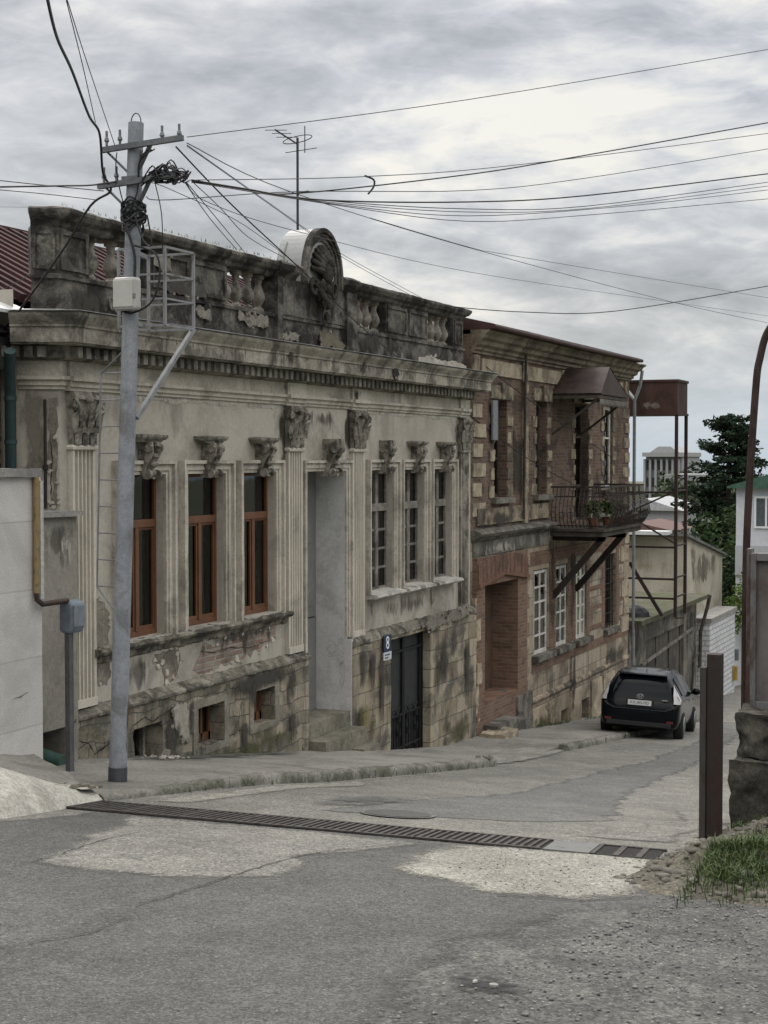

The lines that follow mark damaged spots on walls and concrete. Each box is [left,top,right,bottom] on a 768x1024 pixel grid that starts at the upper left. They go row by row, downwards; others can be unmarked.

spalling [154,256,212,323]
flaking render [238,310,269,330]
spalling [419,354,467,368]
damp [51,529,71,565]
damp [691,551,715,582]
damp [130,659,146,689]
spalling [153,647,179,686]
spalling [193,625,277,674]
damp [437,630,474,697]
flaking render [170,702,194,744]
crack [79,733,110,757]